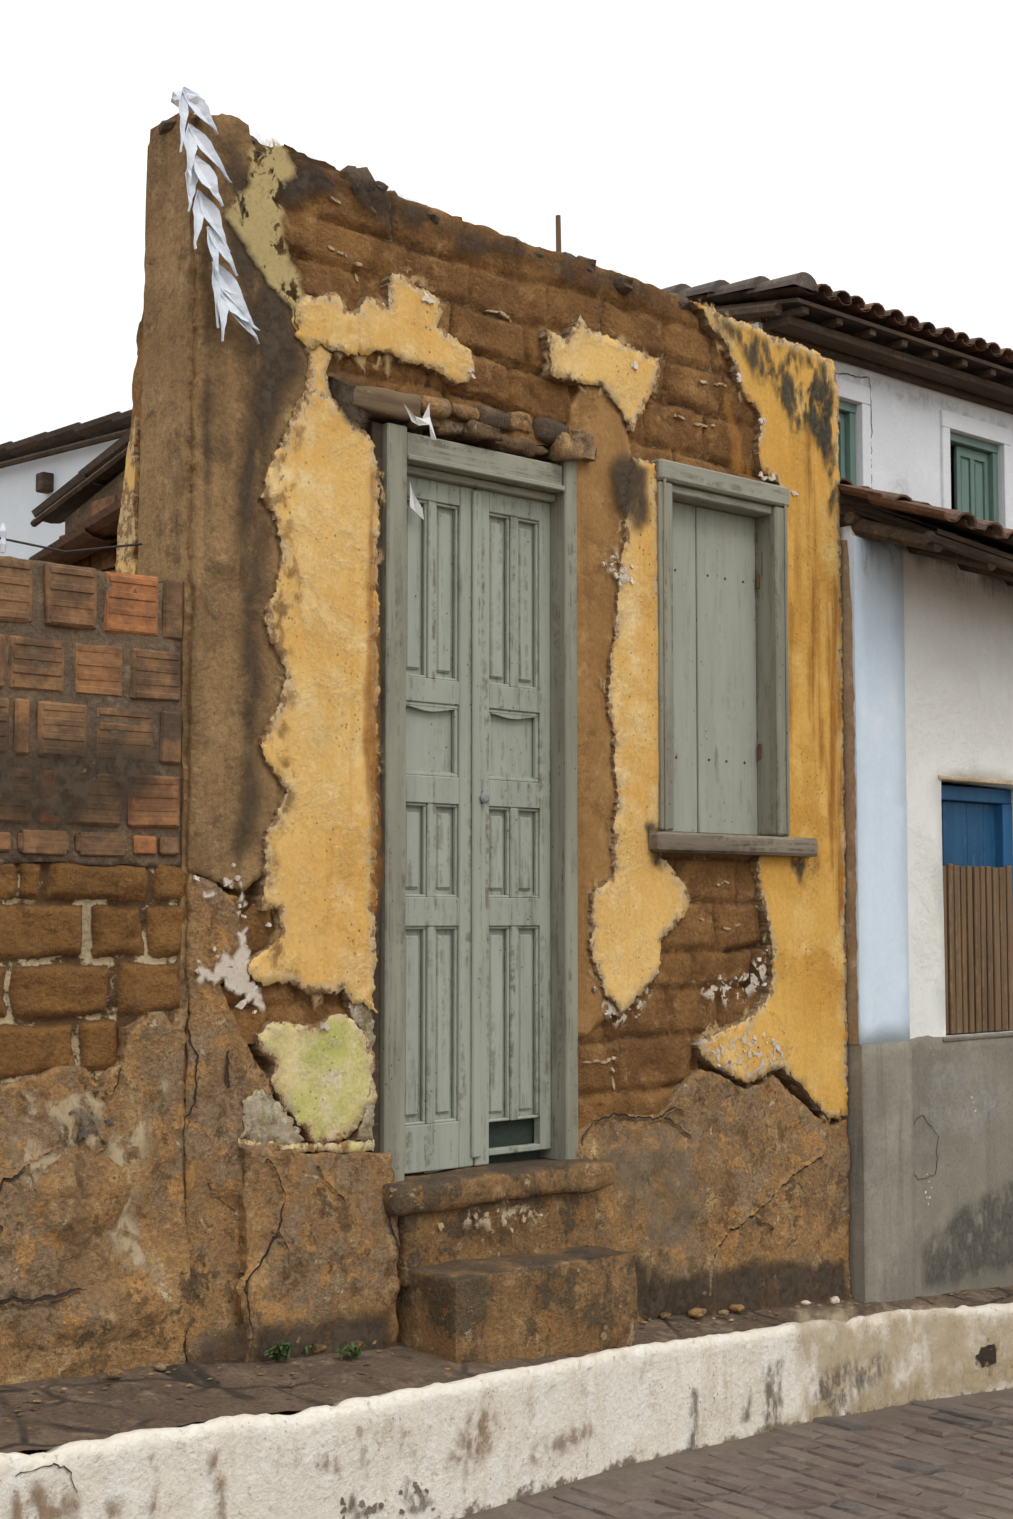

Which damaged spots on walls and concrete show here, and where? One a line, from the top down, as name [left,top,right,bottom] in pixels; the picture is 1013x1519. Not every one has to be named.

spalling [158,119,177,135]
peeling [226,138,776,483]
water stain [723,321,836,511]
water stain [613,456,648,527]
peeling [601,519,634,586]
peeling [193,863,348,1044]
peeling [578,853,784,1129]
crack [184,1025,230,1118]
crack [581,1107,692,1144]
water stain [925,1185,1013,1285]
crack [0,1287,93,1311]